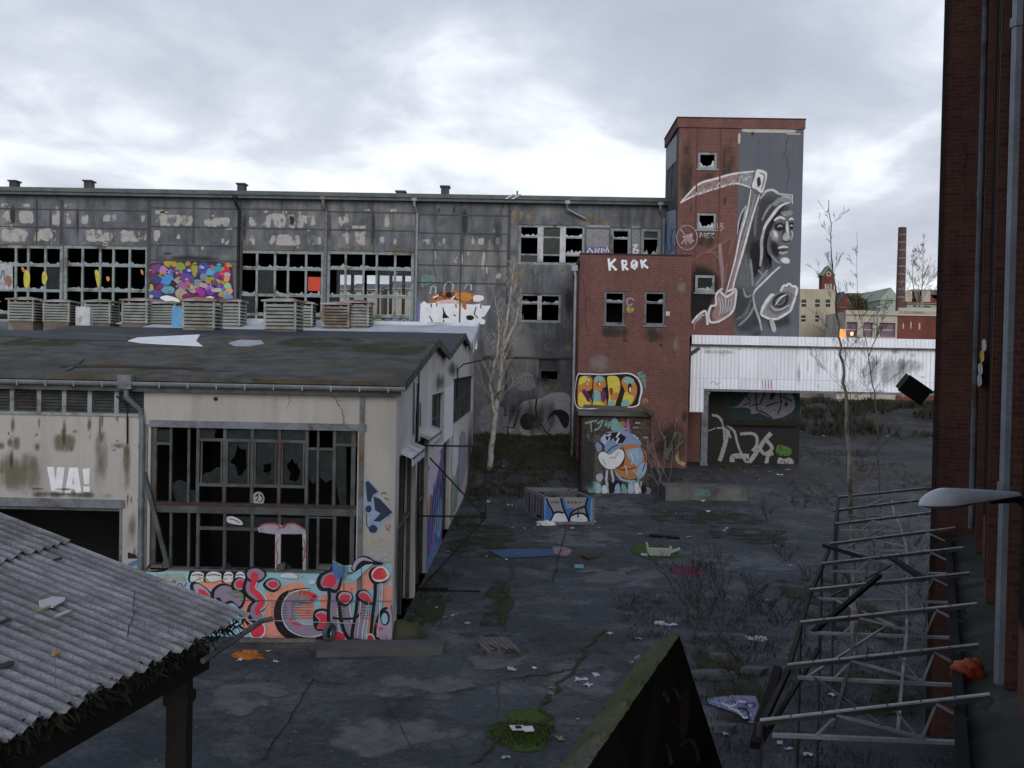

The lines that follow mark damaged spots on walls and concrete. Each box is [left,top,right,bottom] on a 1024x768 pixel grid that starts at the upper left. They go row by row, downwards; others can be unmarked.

peeling [1,203,233,246]
peeling [249,211,321,249]
peeling [338,215,366,245]
water stain [0,422,91,497]
water stain [113,444,129,472]